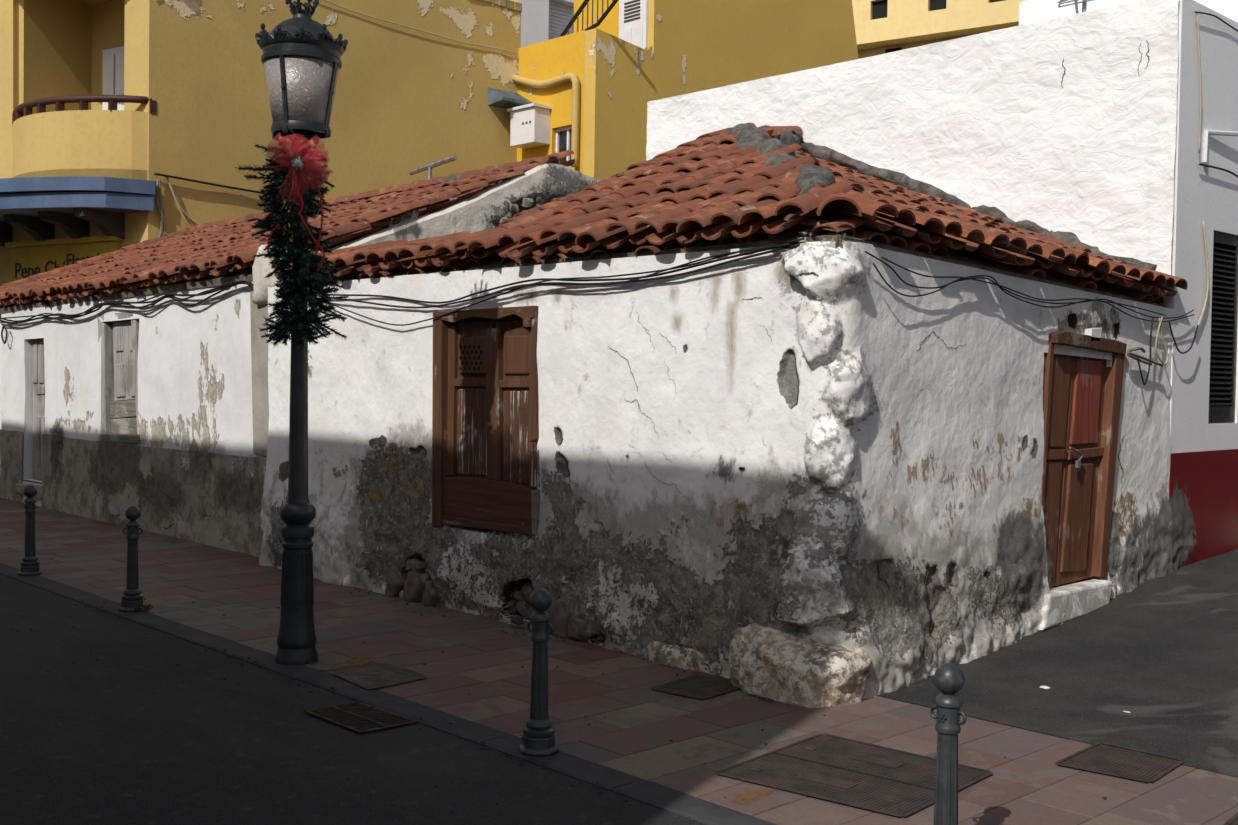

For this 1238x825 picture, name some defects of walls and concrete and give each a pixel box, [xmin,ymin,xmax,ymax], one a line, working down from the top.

peeling [164,0,213,19]
peeling [417,0,521,38]
peeling [451,51,534,111]
peeling [589,36,617,98]
peeling [45,367,101,445]
peeling [137,342,228,452]
crack [608,314,690,503]
peeling [880,421,1040,534]
flaking render [332,427,805,676]
flaking render [818,507,1023,665]